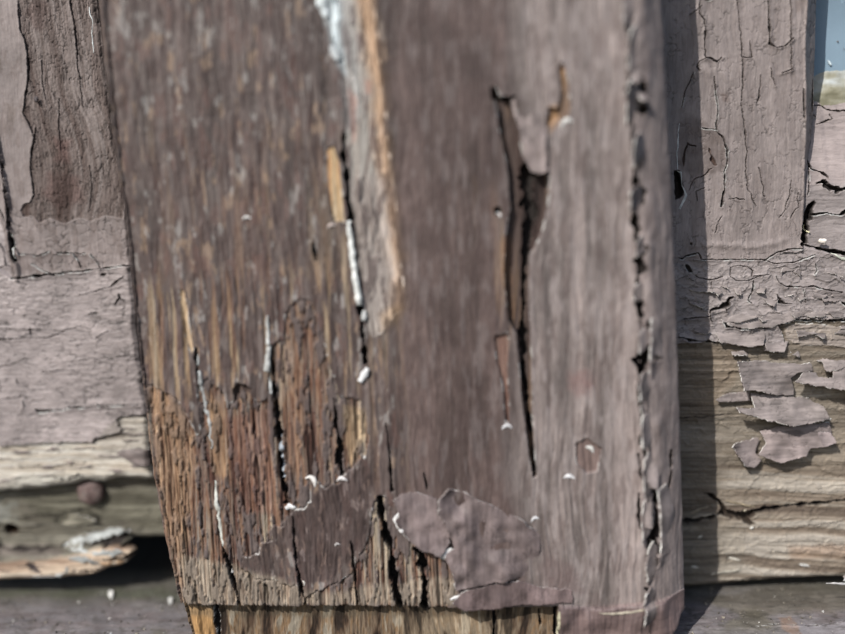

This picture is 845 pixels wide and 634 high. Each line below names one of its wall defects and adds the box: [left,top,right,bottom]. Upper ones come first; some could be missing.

crack [0,4,138,413]
peeling [18,0,125,223]
crack [517,163,539,471]
peeling [622,0,650,124]
peeling [629,185,643,213]
peeling [632,131,644,167]
crack [624,25,673,565]
crack [681,0,794,232]
crack [678,242,845,343]
crack [779,160,845,218]
peeling [0,298,573,634]
peeling [599,288,845,628]